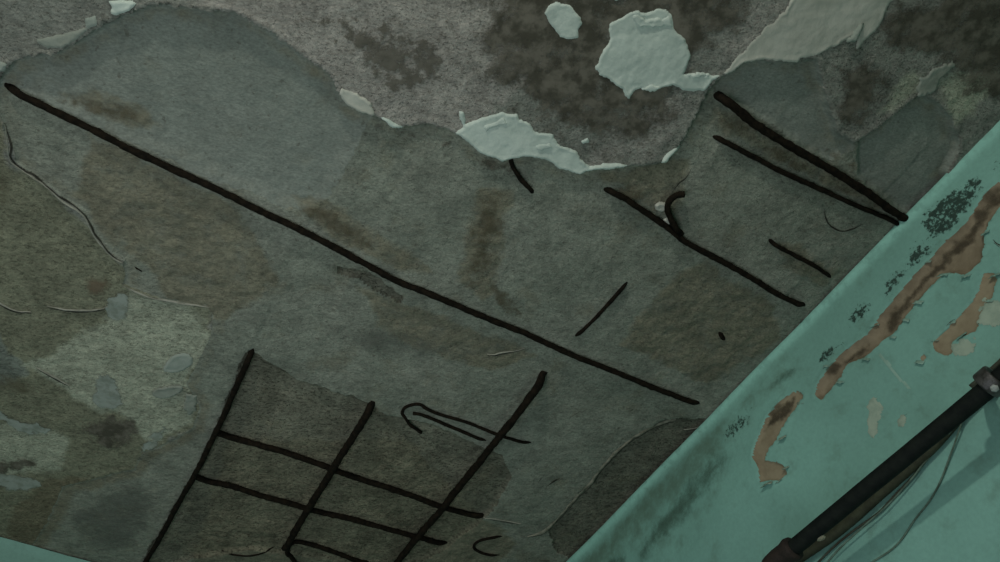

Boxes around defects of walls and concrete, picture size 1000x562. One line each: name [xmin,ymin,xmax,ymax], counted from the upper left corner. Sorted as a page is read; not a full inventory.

spalling [0,3,372,210]
leakage [320,17,442,93]
leakage [482,0,749,139]
rust [712,91,909,226]
spalling [708,59,961,214]
rust [4,83,700,405]
flaking render [0,86,899,562]
rust [603,187,805,307]
rust [768,239,831,278]
peeling [815,182,1000,400]
rust [143,348,547,562]